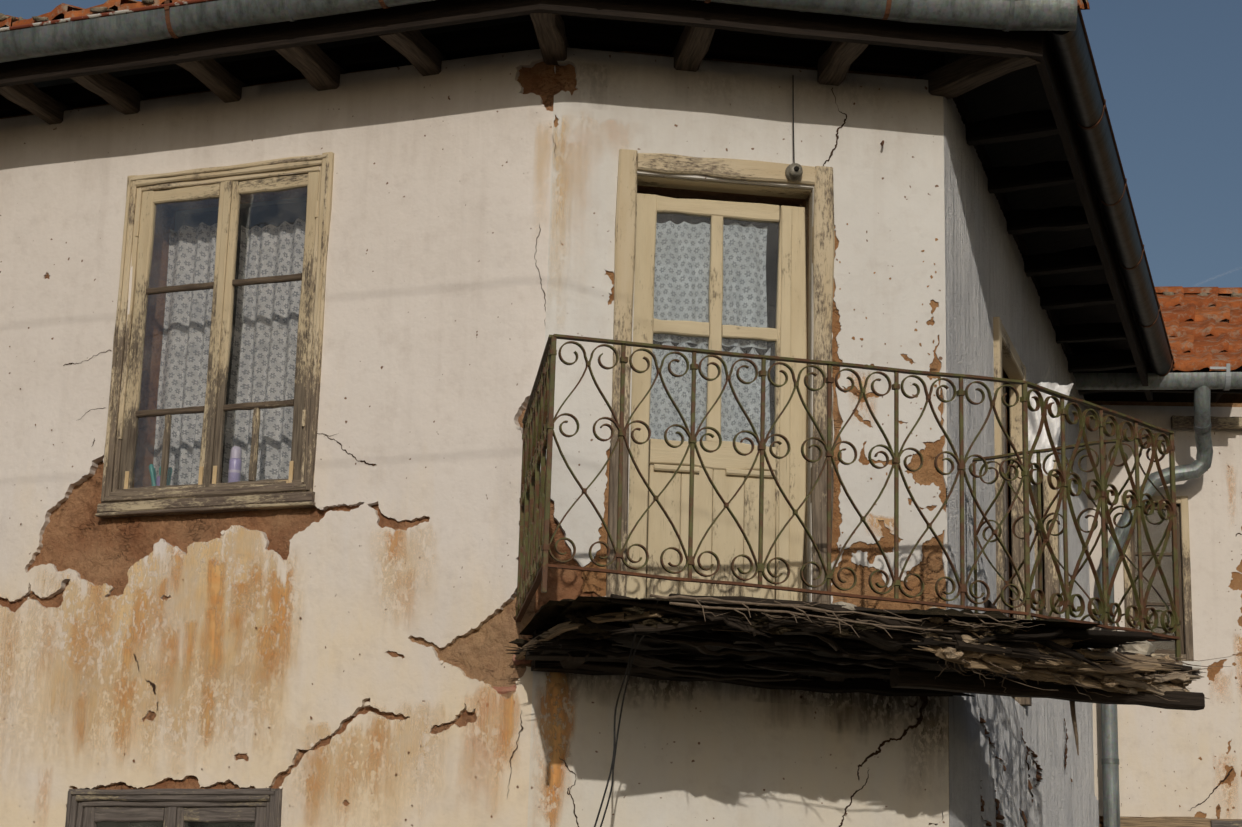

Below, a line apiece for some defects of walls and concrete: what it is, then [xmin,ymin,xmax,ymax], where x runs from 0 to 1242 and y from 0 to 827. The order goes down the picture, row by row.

spalling [517,61,578,127]
crack [823,88,847,166]
flaking render [905,238,946,512]
flaking render [831,282,946,610]
water stain [52,527,290,734]
spalling [0,461,430,612]
spalling [410,448,610,734]
flaking render [1207,652,1242,687]
flaking render [1228,560,1242,627]
spalling [73,753,255,790]
spalling [271,699,409,789]
crack [839,696,928,827]